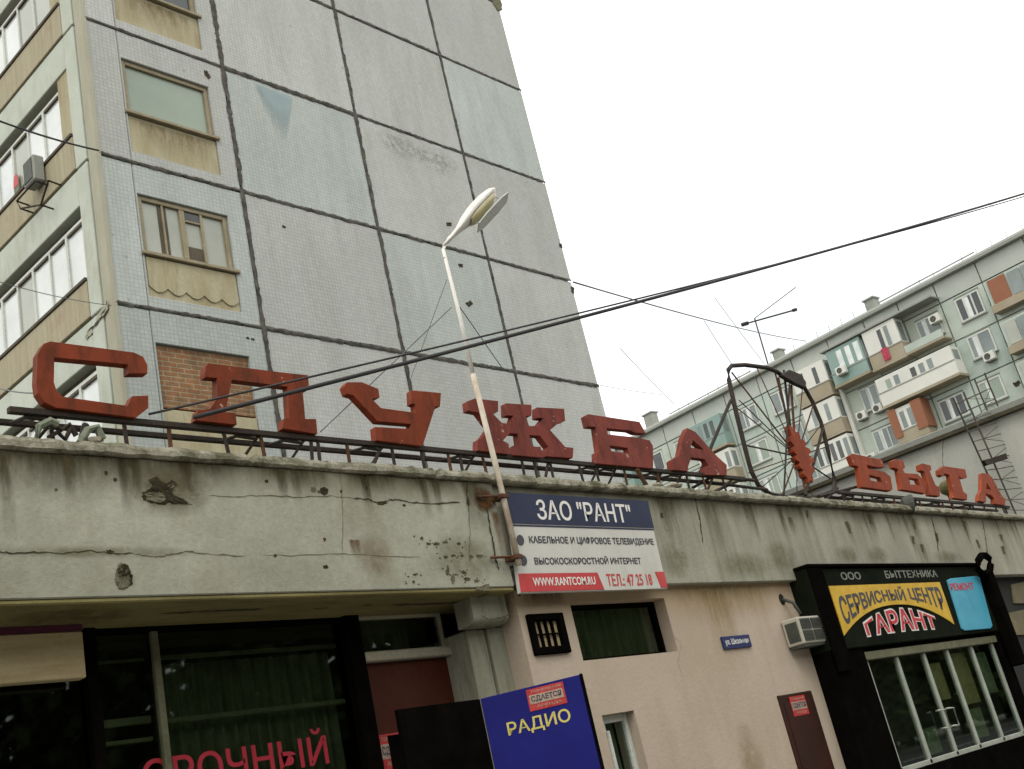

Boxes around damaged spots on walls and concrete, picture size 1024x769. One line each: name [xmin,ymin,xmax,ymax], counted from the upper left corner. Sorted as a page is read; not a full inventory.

spalling [141,473,189,505]
crack [0,549,239,557]
crack [210,470,521,621]
peeling [413,535,486,584]
spalling [114,563,133,590]